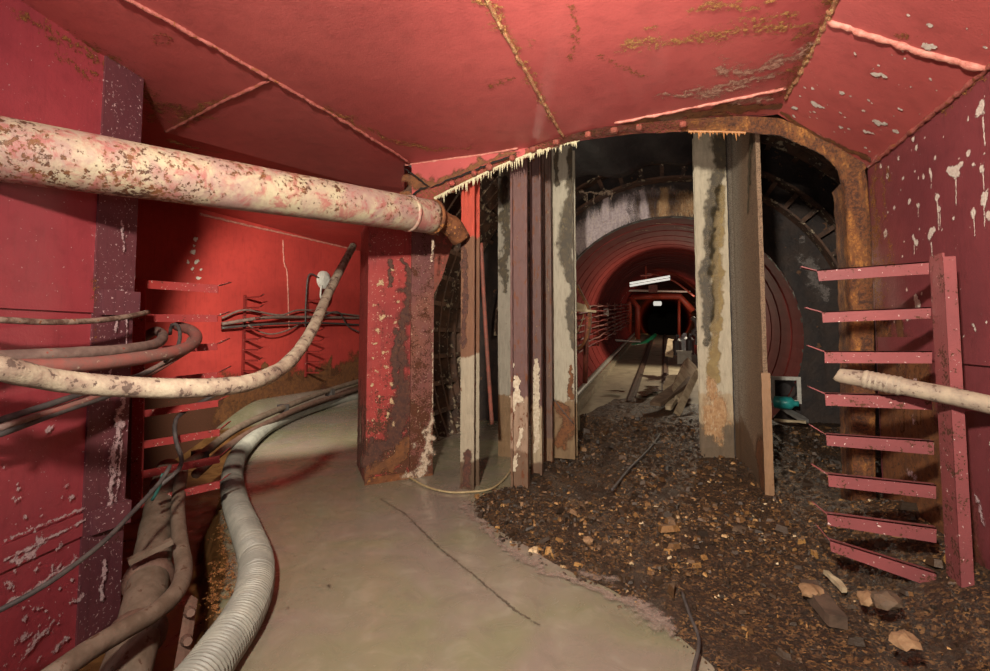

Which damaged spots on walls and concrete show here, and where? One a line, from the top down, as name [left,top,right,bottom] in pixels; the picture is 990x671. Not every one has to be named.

rust [597,0,895,266]
leakage [553,133,727,350]
rust [702,133,736,457]
peeling [106,397,126,506]
rust [362,258,411,478]
peeling [509,358,540,472]
rust [553,365,575,450]
rust [755,434,764,491]
peeling [4,553,79,604]
peeling [3,506,86,566]
peeling [98,559,107,601]
crack [382,500,540,625]